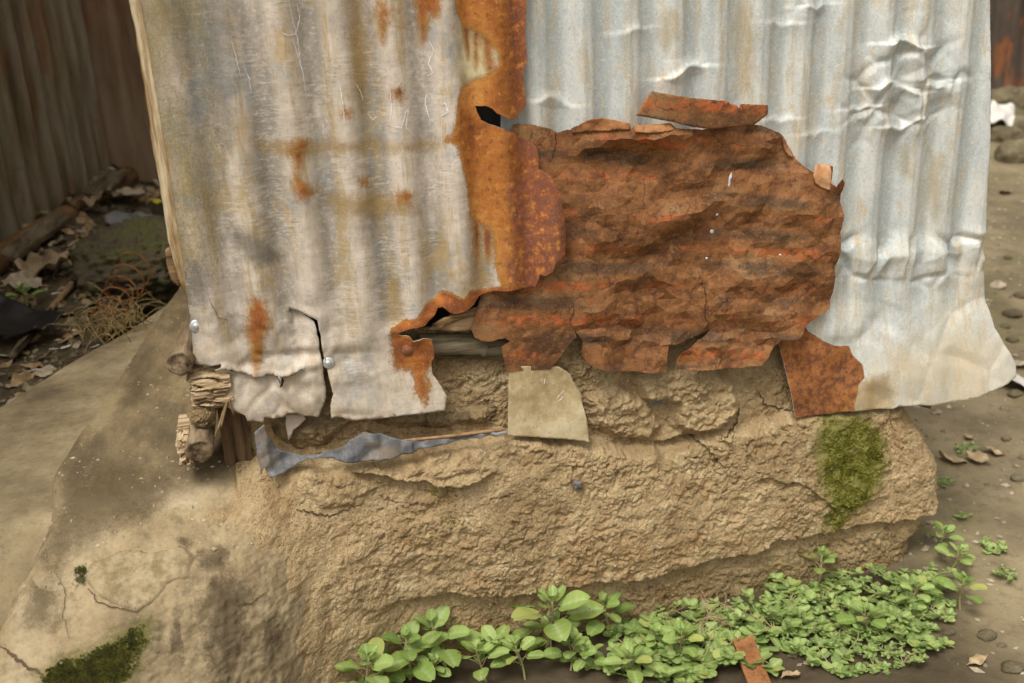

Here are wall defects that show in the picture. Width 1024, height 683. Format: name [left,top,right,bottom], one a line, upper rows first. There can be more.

rust [389,0,864,418]
rust [246,297,271,375]
crack [688,392,794,468]